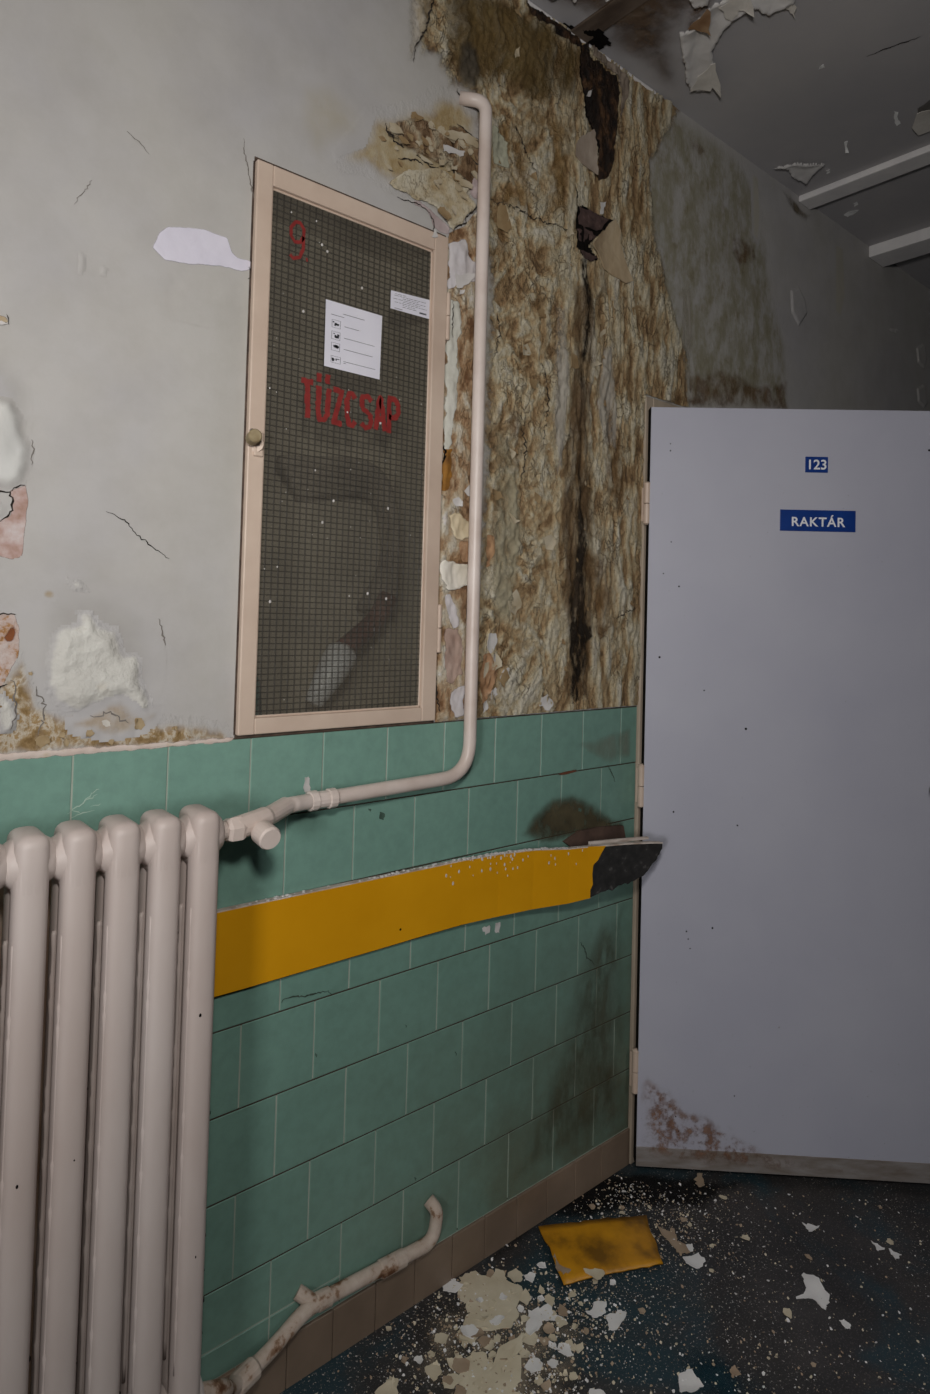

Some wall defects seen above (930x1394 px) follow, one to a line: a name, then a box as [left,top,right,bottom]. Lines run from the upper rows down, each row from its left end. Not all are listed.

damp [615,0,688,53]
peeling [679,0,797,98]
damp [287,0,578,236]
peeling [894,100,930,136]
peeling [774,162,830,185]
damp [649,110,793,409]
peeling [379,0,690,722]
damp [555,259,616,701]
spalling [0,613,19,688]
corrosion [650,1091,747,1162]